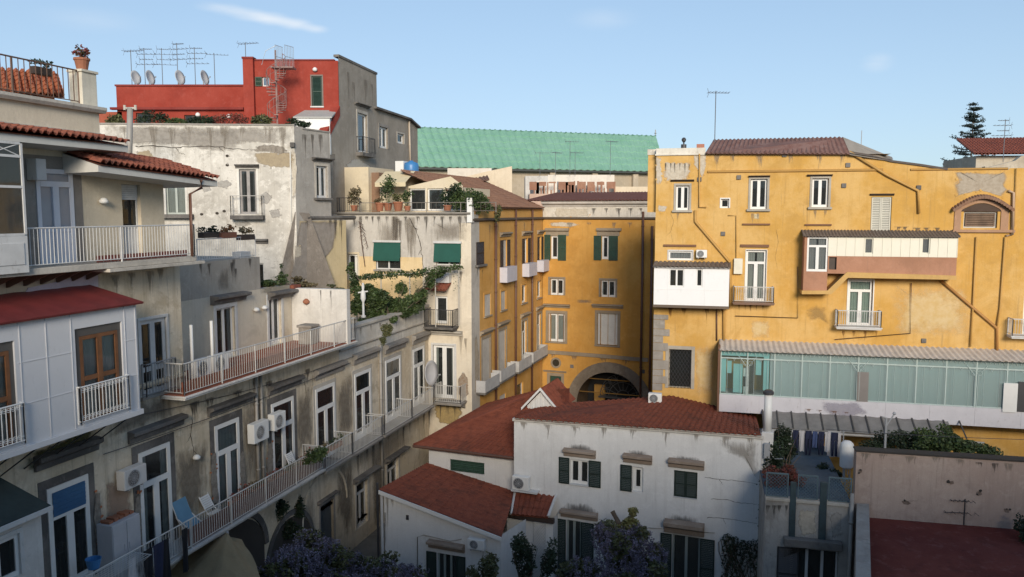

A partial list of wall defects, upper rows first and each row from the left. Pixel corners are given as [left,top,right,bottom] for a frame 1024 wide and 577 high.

water stain [120,127,277,150]
flaking render [250,144,297,198]
peeling [655,155,707,183]
flaking render [955,171,1006,198]
water stain [329,216,467,240]